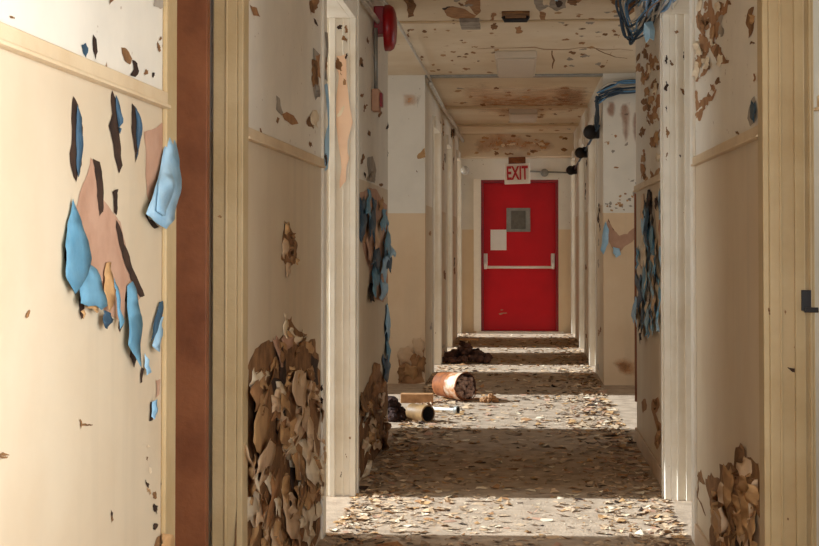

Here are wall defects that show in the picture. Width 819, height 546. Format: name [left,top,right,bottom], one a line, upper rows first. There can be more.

peeling [64,96,160,421]
peeling [109,91,182,229]
peeling [151,301,164,352]
peeling [281,222,300,277]
peeling [276,32,353,188]
peeling [359,154,426,478]
peeling [534,0,636,68]
peeling [597,43,674,341]
peeling [692,0,731,121]
peeling [153,523,175,546]
peeling [245,313,327,546]
peeling [697,443,760,546]